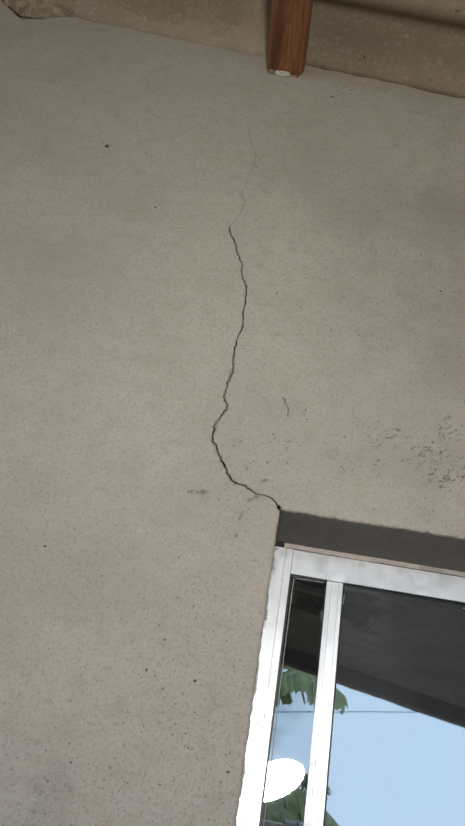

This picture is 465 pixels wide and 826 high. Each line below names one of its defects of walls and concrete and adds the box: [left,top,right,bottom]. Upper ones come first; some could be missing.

spalling [3,0,78,20]
crack [208,125,281,533]